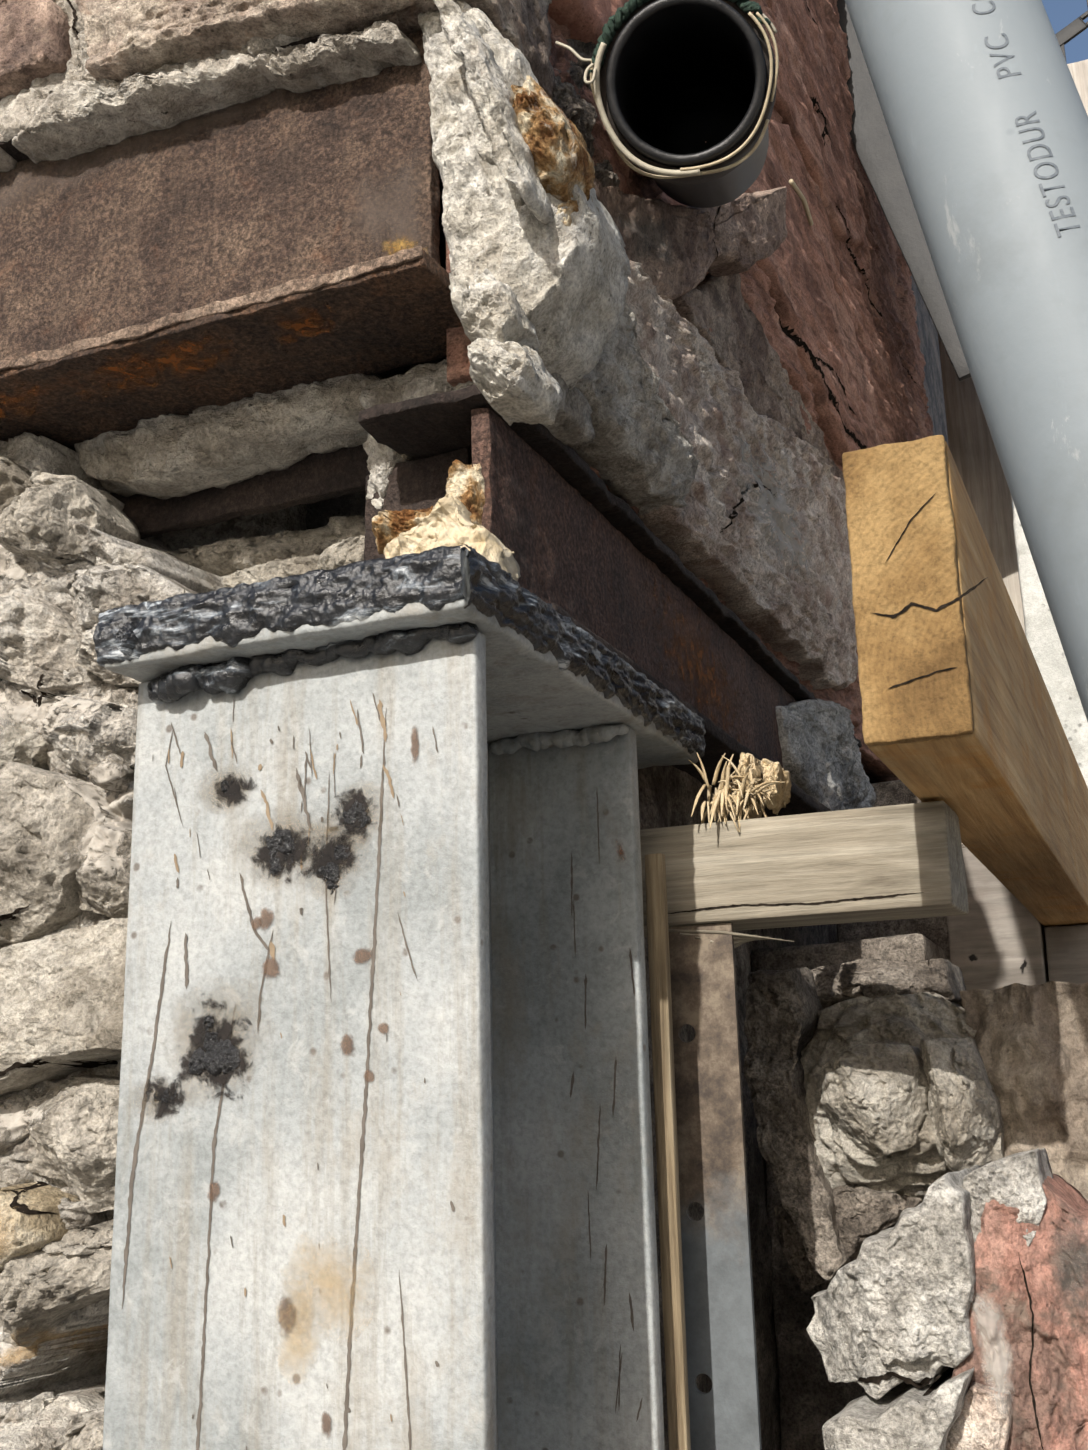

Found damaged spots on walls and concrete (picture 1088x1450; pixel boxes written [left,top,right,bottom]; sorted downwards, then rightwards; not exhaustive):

corrosion [97,341,227,389]
crack [0,904,31,926]
crack [0,1059,118,1076]